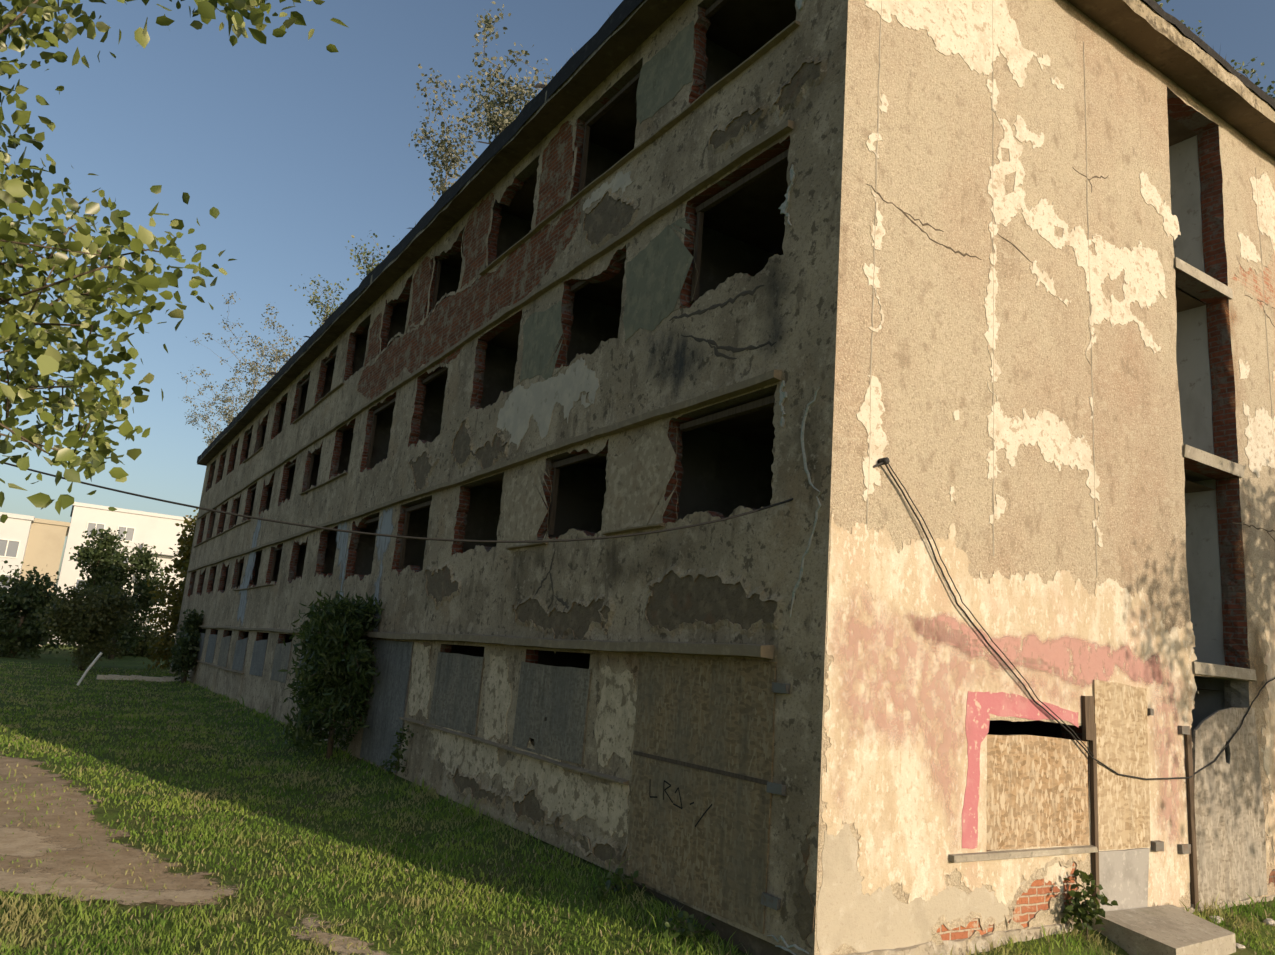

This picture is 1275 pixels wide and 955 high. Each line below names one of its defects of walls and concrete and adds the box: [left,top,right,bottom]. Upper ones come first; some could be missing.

flaking render [356,116,640,406]
crack [867,184,1033,263]
peeling [862,0,1167,548]
peeling [1139,171,1181,241]
flaking render [1228,172,1275,317]
peeling [408,300,600,491]
peeling [502,467,552,554]
peeling [856,375,889,502]
peeling [1242,401,1275,478]
peeling [408,641,637,870]
peeling [792,511,1199,955]
peeling [1261,619,1275,886]